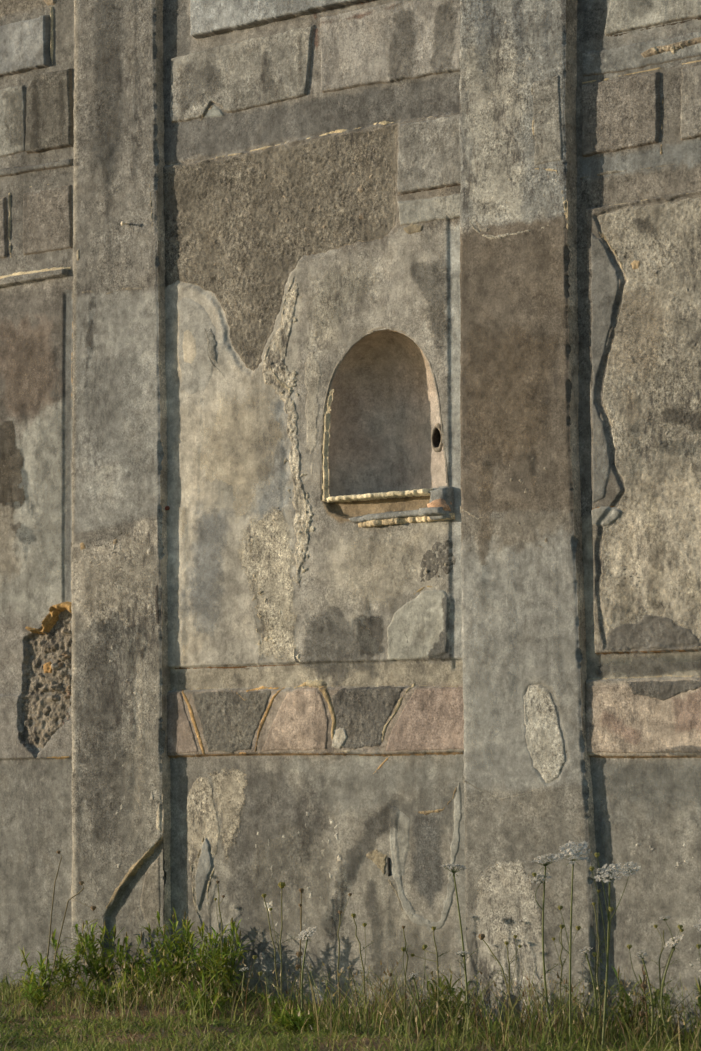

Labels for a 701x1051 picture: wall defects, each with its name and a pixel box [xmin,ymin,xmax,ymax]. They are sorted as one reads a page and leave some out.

peeling [163,121,423,661]
peeling [523,684,567,783]